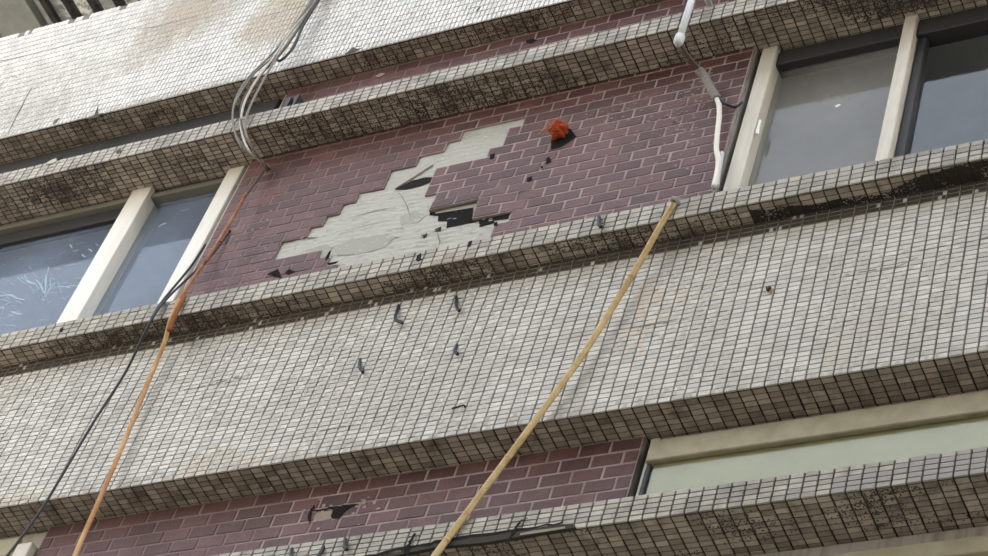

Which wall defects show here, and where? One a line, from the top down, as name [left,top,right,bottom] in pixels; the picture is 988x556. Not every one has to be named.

water stain [0,0,311,156]
water stain [351,0,593,73]
spalling [267,119,524,278]